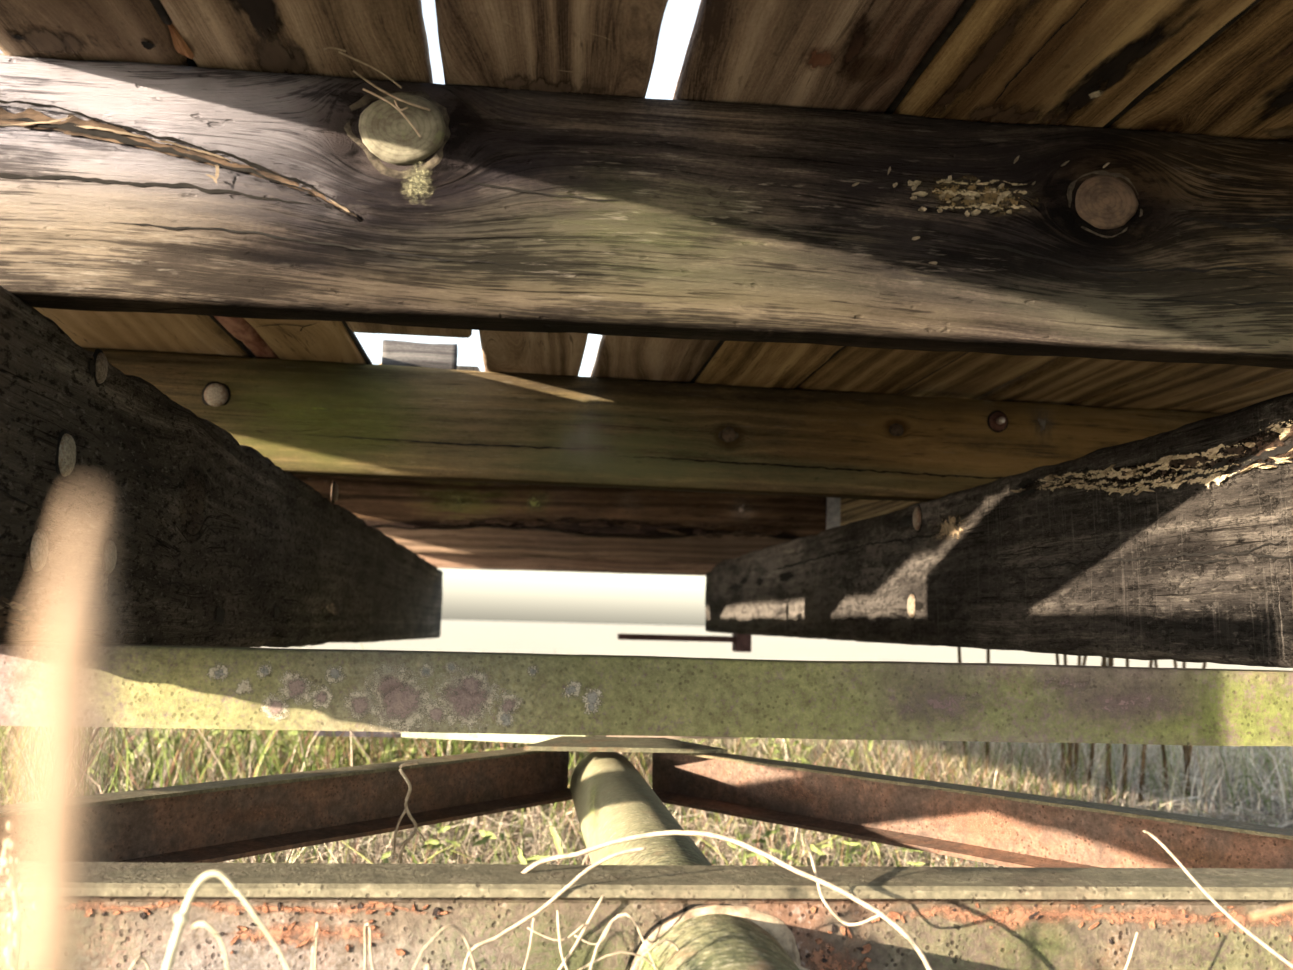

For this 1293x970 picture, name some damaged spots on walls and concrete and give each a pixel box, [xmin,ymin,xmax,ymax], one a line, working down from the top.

peeling [887,166,1038,217]
peeling [1011,428,1293,495]
rust [805,912,871,970]
rust [871,903,1293,944]